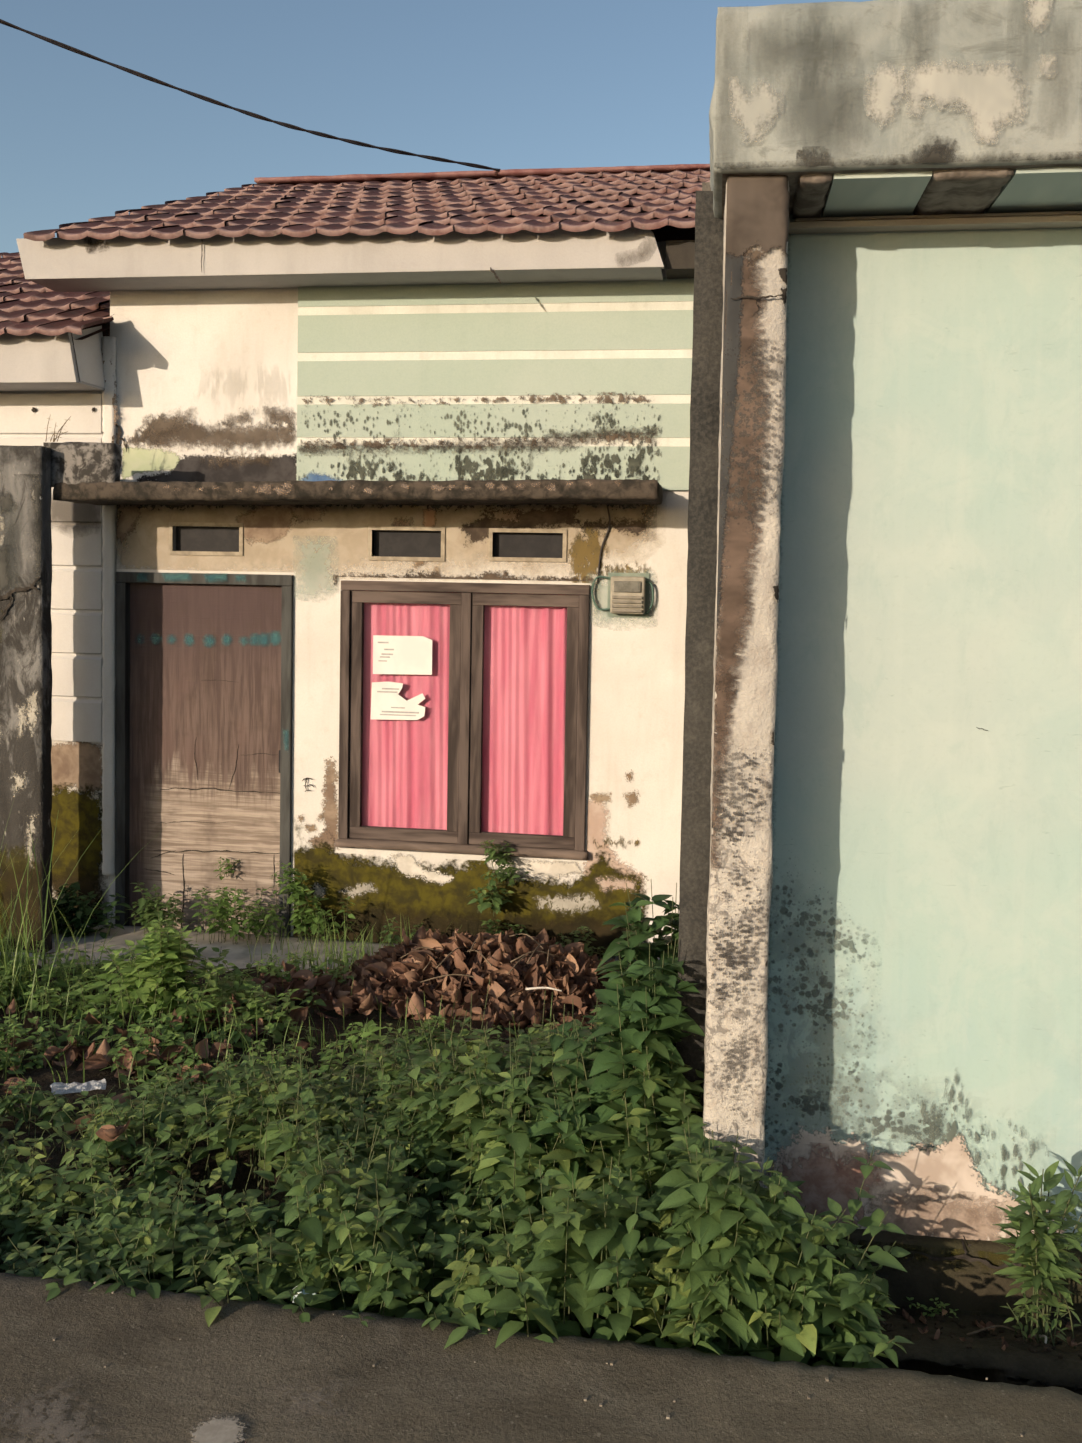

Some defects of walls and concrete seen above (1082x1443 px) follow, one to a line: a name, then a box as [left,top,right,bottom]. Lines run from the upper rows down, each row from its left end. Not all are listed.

peeling [866,61,1029,145]
water stain [865,139,963,165]
peeling [101,349,657,482]
water stain [128,405,661,481]
water stain [0,492,16,514]
water stain [24,474,99,584]
water stain [118,504,654,571]
water stain [706,147,1035,1202]
peeling [51,741,103,800]
peeling [391,853,454,886]
peeling [512,772,644,914]
peeling [763,1122,1067,1241]